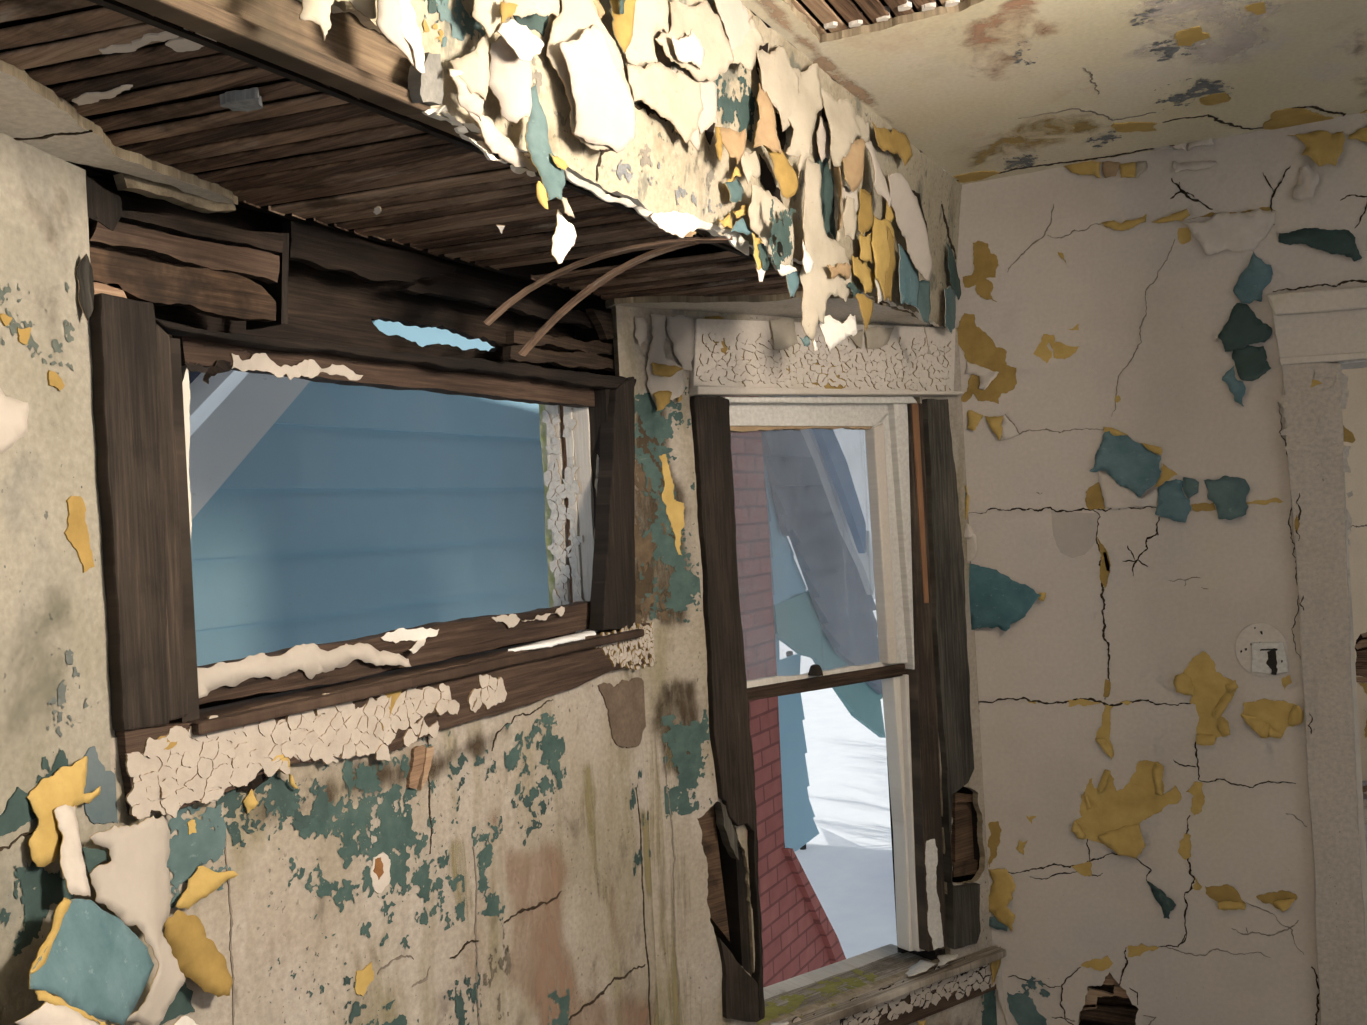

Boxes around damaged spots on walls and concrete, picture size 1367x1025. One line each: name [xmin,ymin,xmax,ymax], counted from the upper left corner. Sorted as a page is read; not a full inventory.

water stain [969,0,1034,44]
water stain [973,119,1098,165]
crack [999,67,1263,210]
peeling [299,0,1019,441]
peeling [1101,207,1362,407]
peeling [1085,427,1283,523]
crack [970,492,1207,706]
peeling [597,677,646,748]
crack [1174,742,1307,827]
peeling [0,746,239,1025]
crack [1009,839,1152,881]
crack [1119,815,1320,1025]